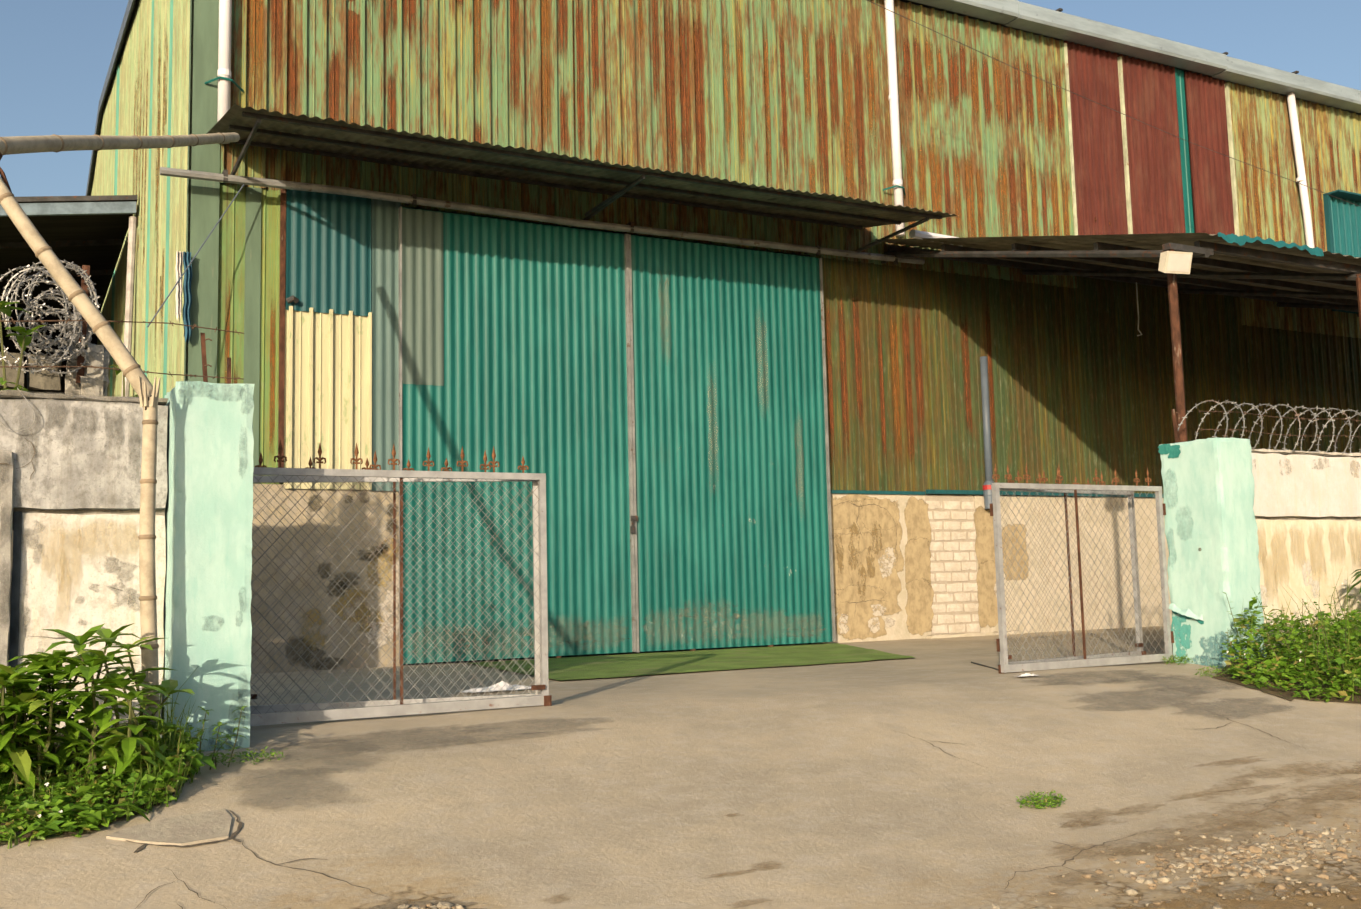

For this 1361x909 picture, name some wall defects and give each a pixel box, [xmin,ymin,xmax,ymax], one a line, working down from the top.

rust [246,0,298,112]
rust [456,0,520,108]
rust [540,0,601,161]
rust [638,0,705,174]
rust [722,22,745,159]
rust [762,30,788,185]
rust [802,25,877,198]
rust [903,38,1063,137]
rust [906,145,1070,237]
rust [1242,133,1285,242]
rust [1308,138,1361,251]
crack [126,810,387,909]